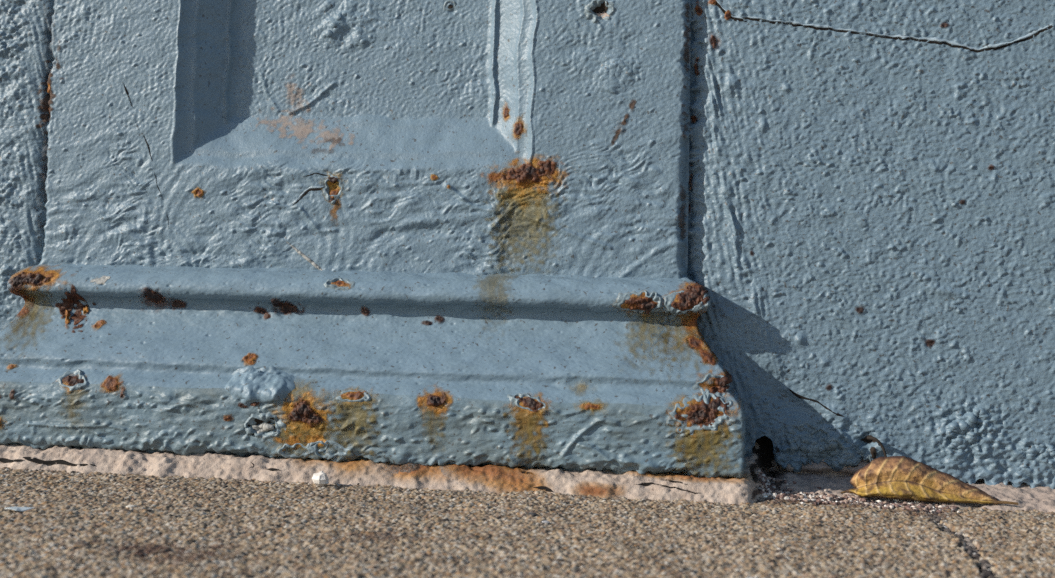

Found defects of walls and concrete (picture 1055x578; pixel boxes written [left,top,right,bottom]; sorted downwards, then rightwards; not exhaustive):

crack [715,0,1054,52]
corrosion [322,172,343,219]
corrosion [486,158,566,271]
corrosion [9,266,66,335]
corrosion [144,288,186,308]
corrosion [254,299,304,319]
corrosion [612,283,741,481]
corrosion [273,388,378,470]
corrosion [386,389,555,492]